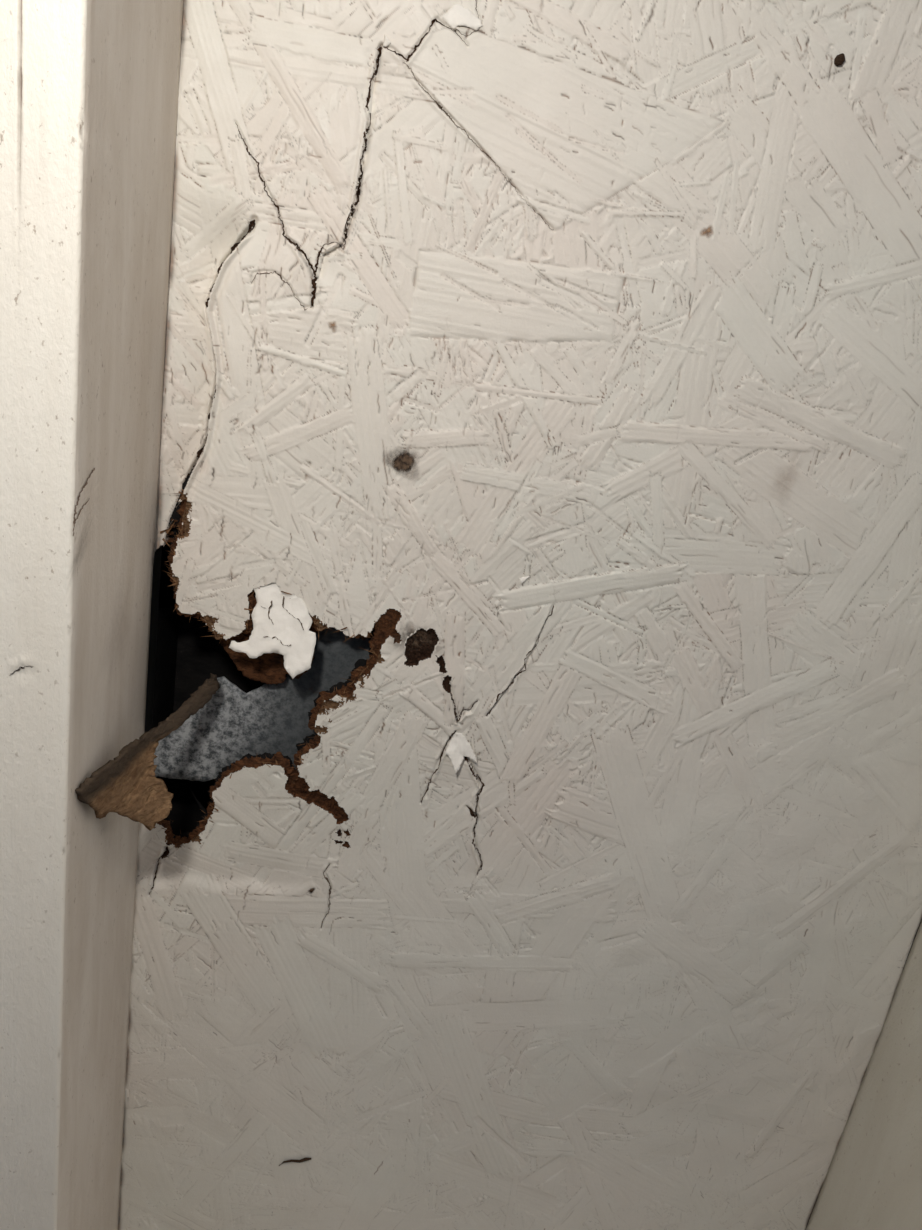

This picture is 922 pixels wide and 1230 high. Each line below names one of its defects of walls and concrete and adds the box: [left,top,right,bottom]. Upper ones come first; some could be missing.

crack [205,0,552,310]
crack [185,389,216,480]
spalling [157,472,380,846]
crack [421,605,554,875]